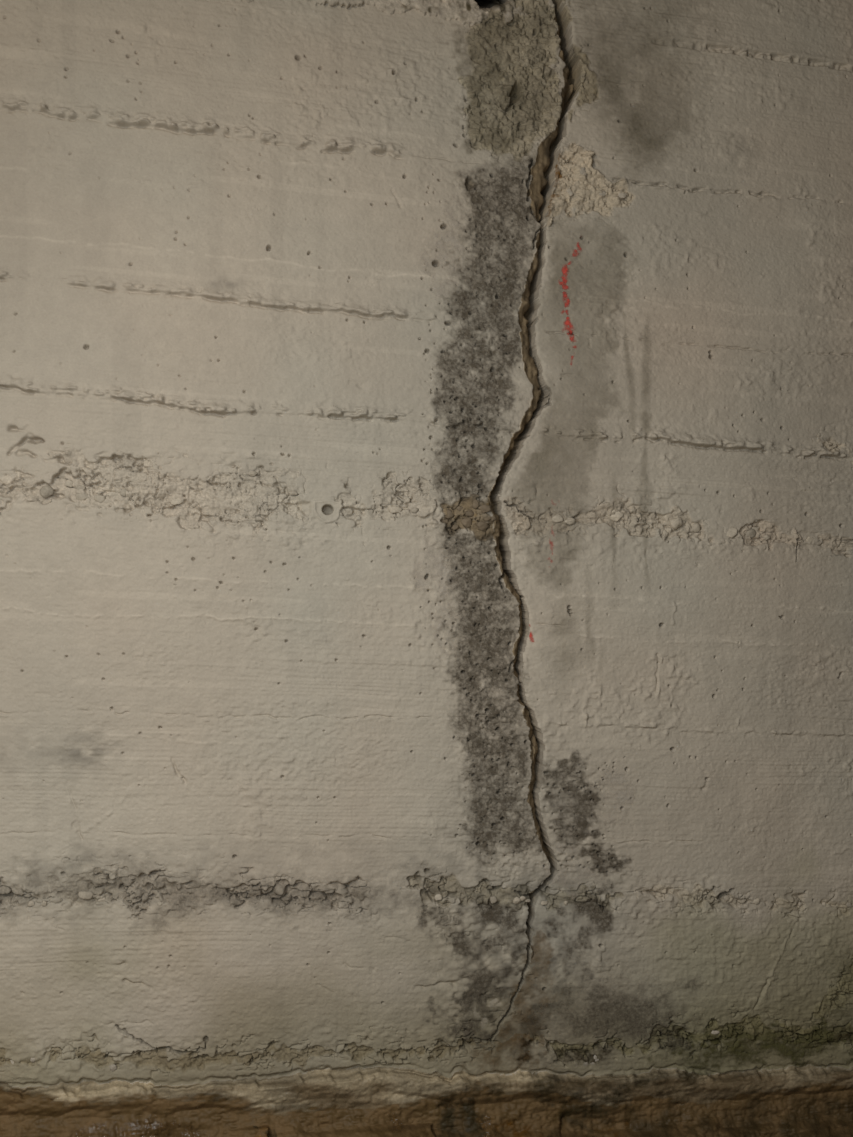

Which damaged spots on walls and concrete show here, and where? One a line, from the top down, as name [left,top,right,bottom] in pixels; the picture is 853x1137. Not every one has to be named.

spalling [291,0,600,162]
damp [433,158,535,497]
spalling [546,143,635,227]
crack [470,0,593,1044]
damp [416,526,535,863]
damp [542,753,631,954]